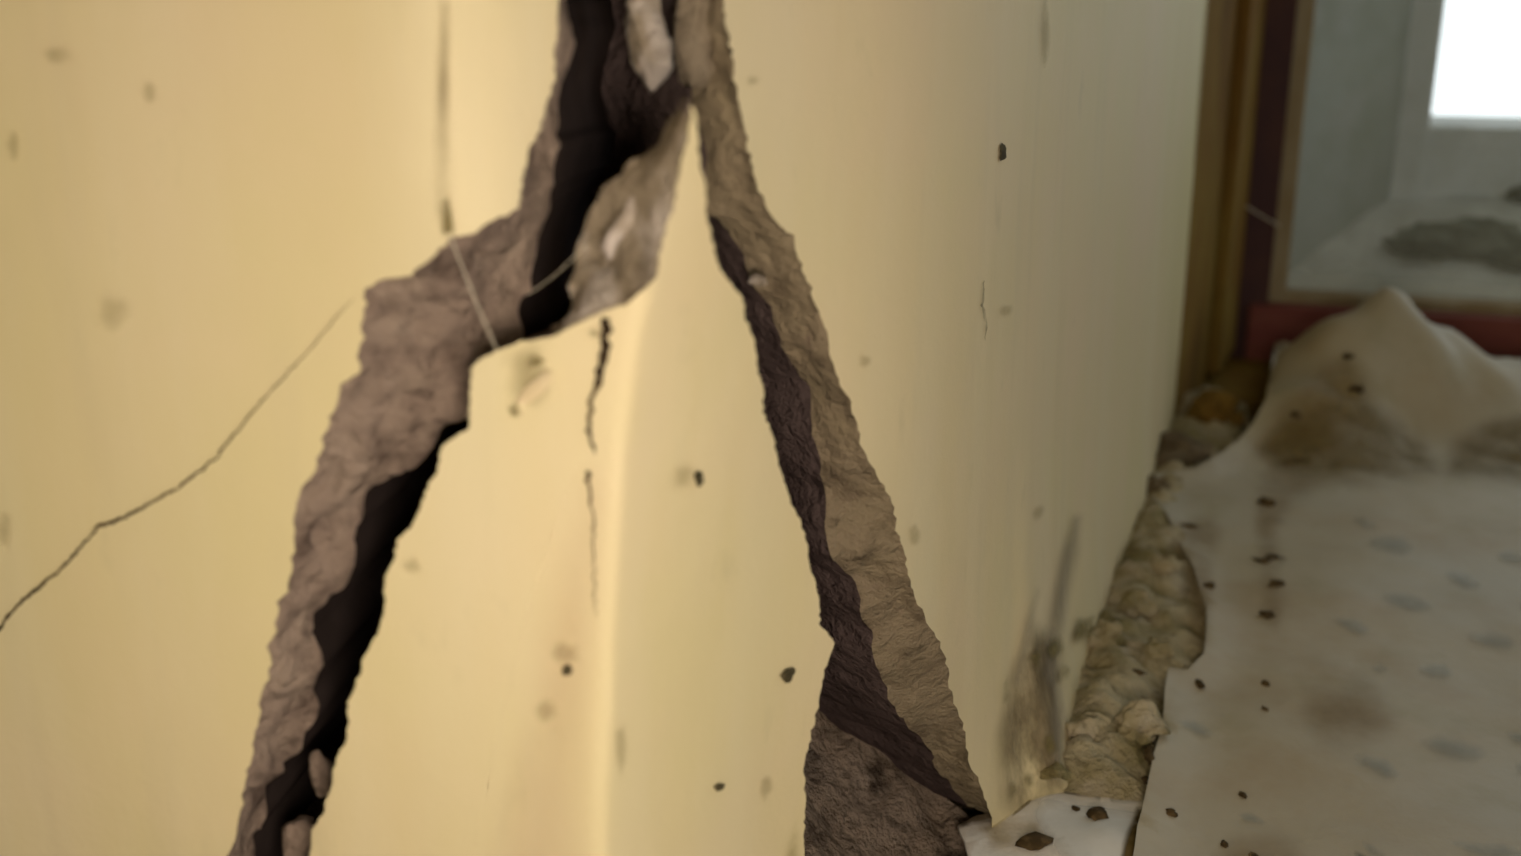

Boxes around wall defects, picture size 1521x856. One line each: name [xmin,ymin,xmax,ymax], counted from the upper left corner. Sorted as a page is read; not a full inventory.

crack [0,0,992,856]